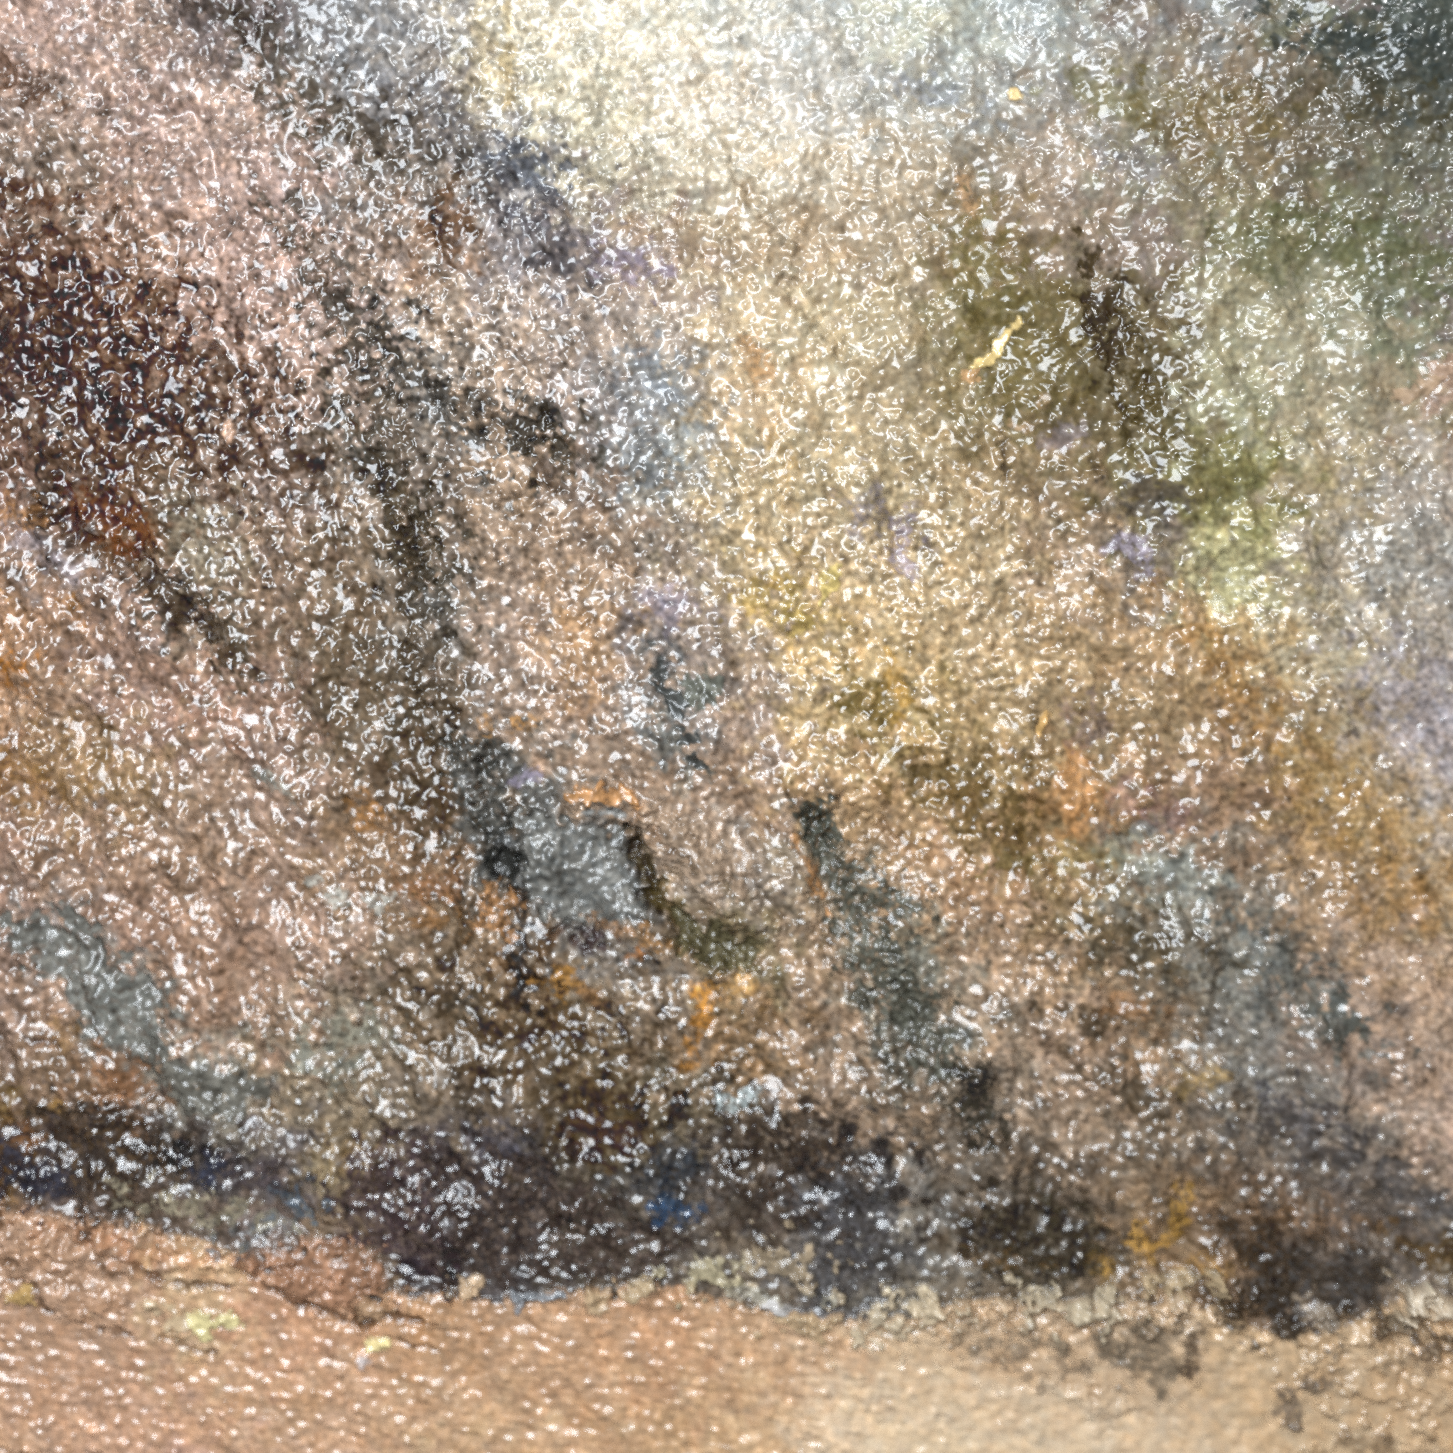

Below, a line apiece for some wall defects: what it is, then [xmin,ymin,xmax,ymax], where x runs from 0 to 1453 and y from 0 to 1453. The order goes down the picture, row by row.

damp [1099,532,1153,576]
damp [304,875,397,915]
damp [0,1087,978,1352]
damp [958,1160,1453,1344]